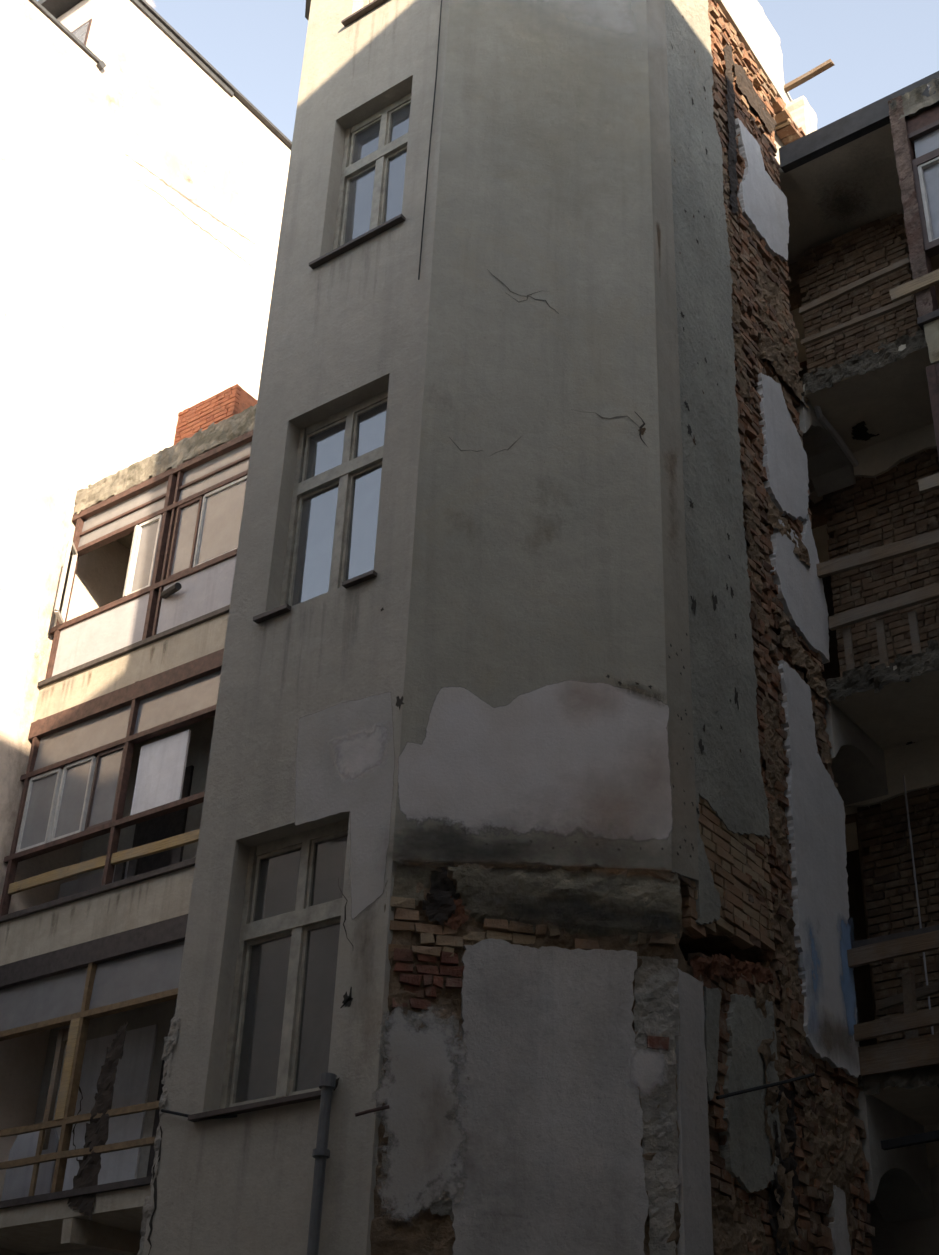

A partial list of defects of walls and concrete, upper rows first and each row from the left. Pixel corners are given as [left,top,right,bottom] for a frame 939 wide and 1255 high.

crack [487,269,559,314]
crack [571,409,647,446]
flaking render [370,0,875,1255]
crack [147,1126,163,1255]